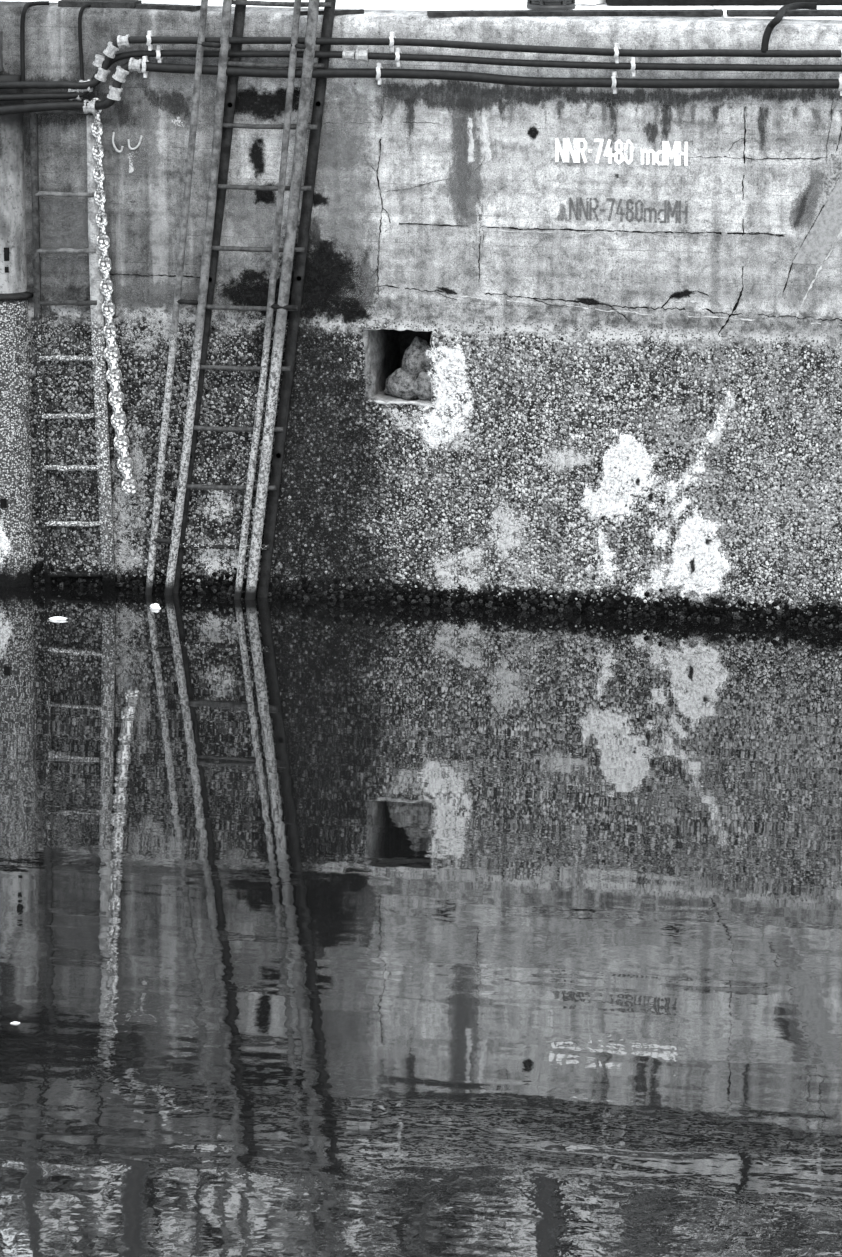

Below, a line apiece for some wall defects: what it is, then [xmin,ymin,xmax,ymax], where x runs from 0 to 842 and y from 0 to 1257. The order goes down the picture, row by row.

crack [279,96,842,335]
damp [375,79,842,238]